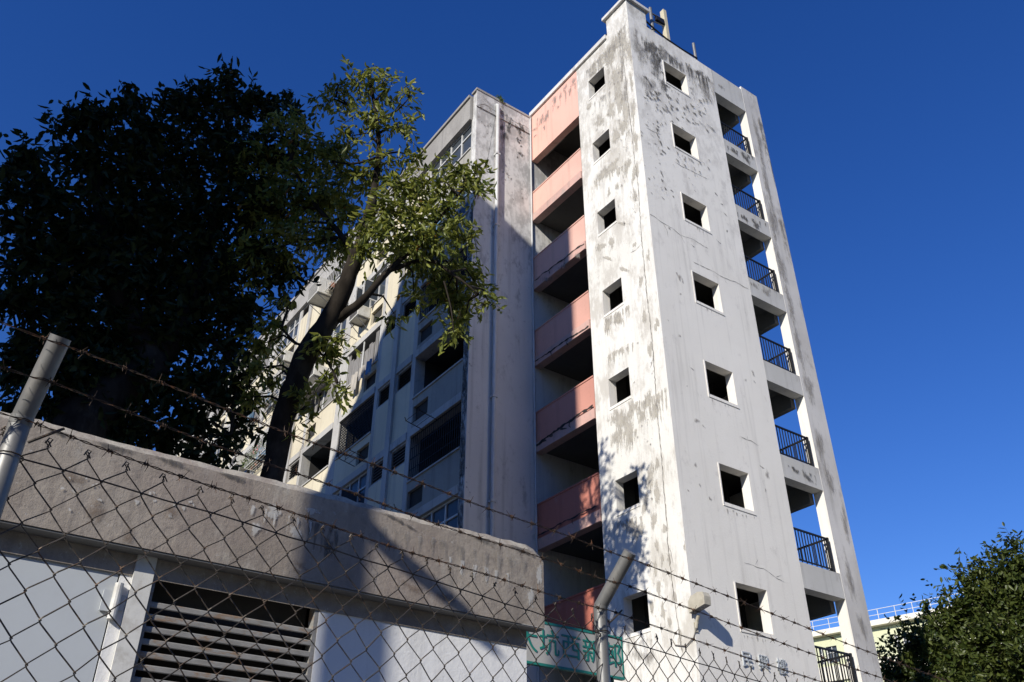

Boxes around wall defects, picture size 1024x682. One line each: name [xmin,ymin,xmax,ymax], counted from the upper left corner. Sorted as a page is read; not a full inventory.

damp [586,25,722,140]
crack [622,48,748,650]